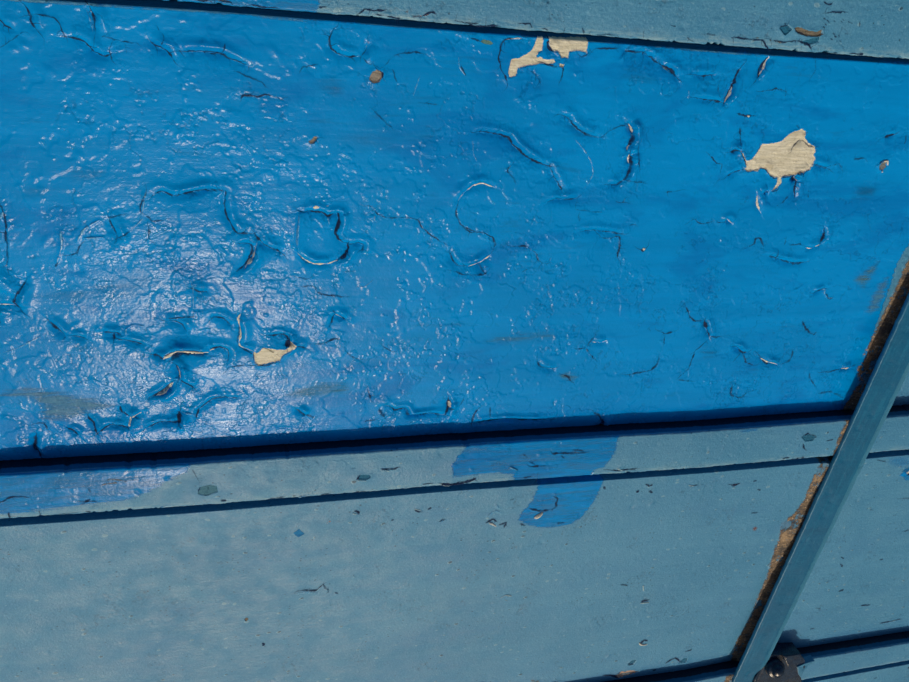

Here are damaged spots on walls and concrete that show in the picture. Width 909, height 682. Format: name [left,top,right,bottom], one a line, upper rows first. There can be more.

crack [0,0,127,59]
crack [150,29,271,98]
crack [359,9,547,88]
peeling [508,35,588,77]
crack [582,2,863,104]
crack [108,189,285,269]
crack [417,114,642,276]
peeling [742,129,816,213]
peeling [154,346,239,367]
peeling [237,314,305,367]
crack [33,361,237,458]
crack [369,396,553,422]